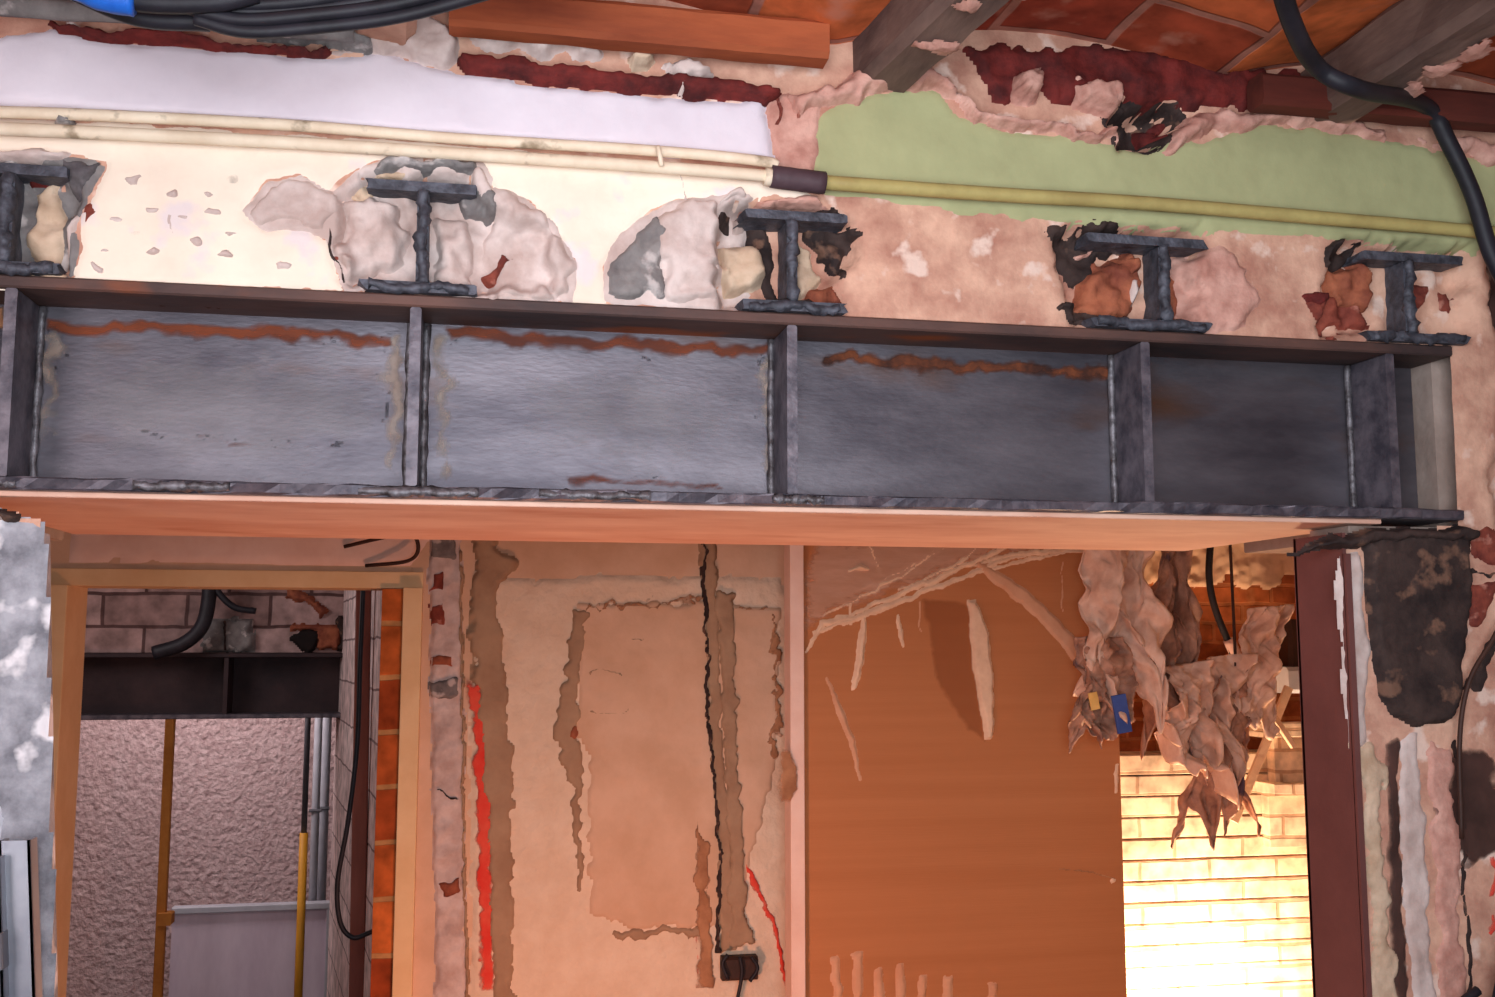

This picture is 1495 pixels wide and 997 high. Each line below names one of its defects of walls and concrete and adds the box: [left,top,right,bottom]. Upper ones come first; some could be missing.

flaking render [48,17,1387,156]
spalling [0,148,122,278]
spalling [242,156,577,303]
spalling [603,175,765,311]
spalling [1044,219,1142,327]
crack [1486,266,1495,329]
rust [43,319,403,459]
rust [434,326,768,423]
rust [569,476,610,484]
crack [1463,526,1495,692]
peeling [1334,552,1473,997]
water stain [1438,751,1495,896]